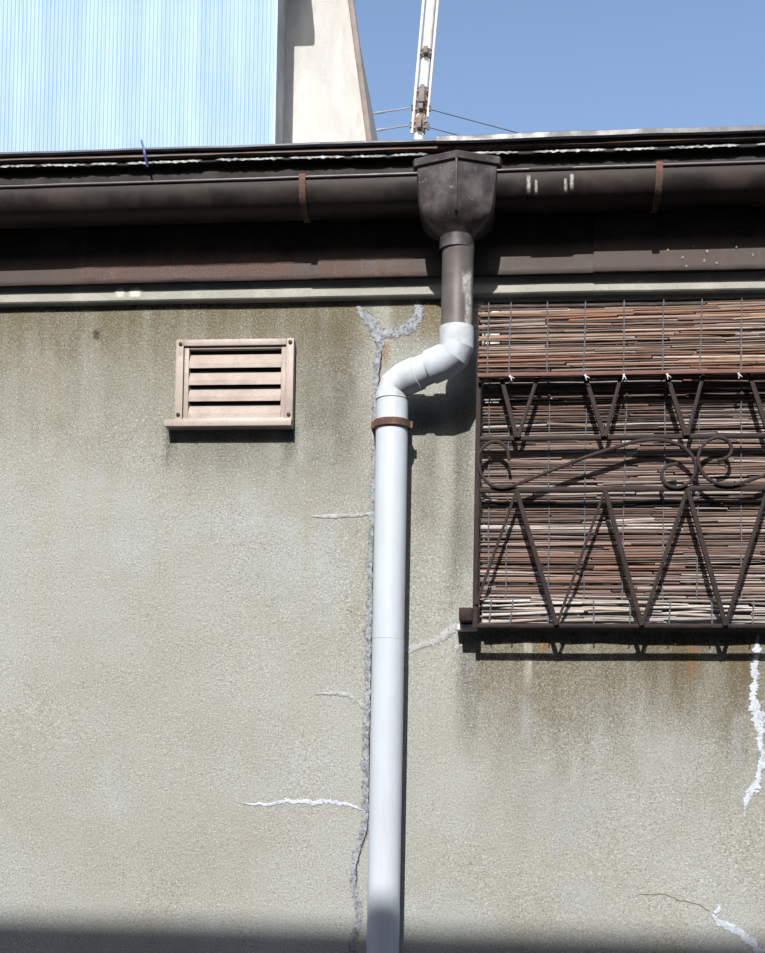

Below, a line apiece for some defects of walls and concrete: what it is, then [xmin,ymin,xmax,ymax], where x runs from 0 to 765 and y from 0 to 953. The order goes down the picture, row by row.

crack [240,300,424,953]
crack [743,633,765,816]
crack [635,892,765,953]